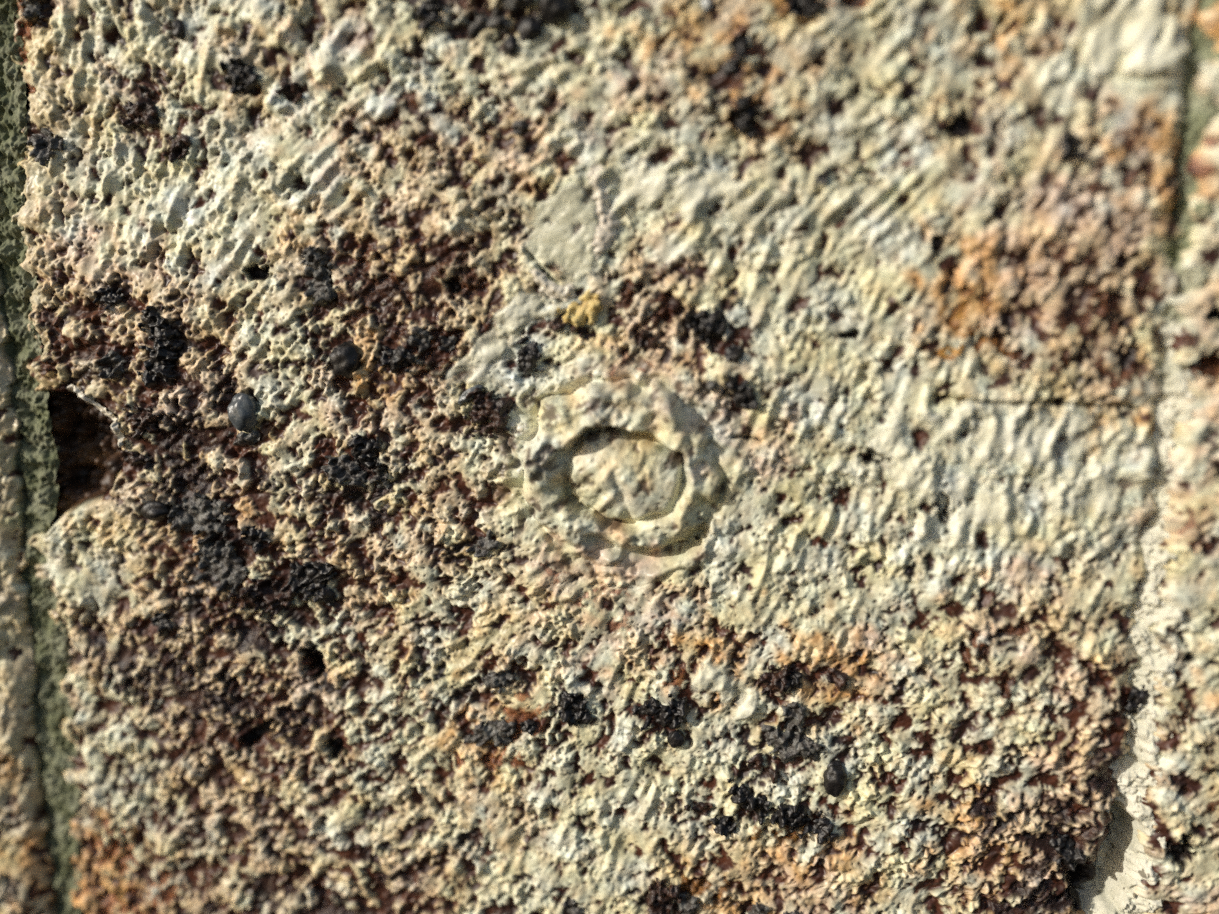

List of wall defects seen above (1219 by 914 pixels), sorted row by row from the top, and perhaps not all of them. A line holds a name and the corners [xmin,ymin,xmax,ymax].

spalling [47,384,124,527]